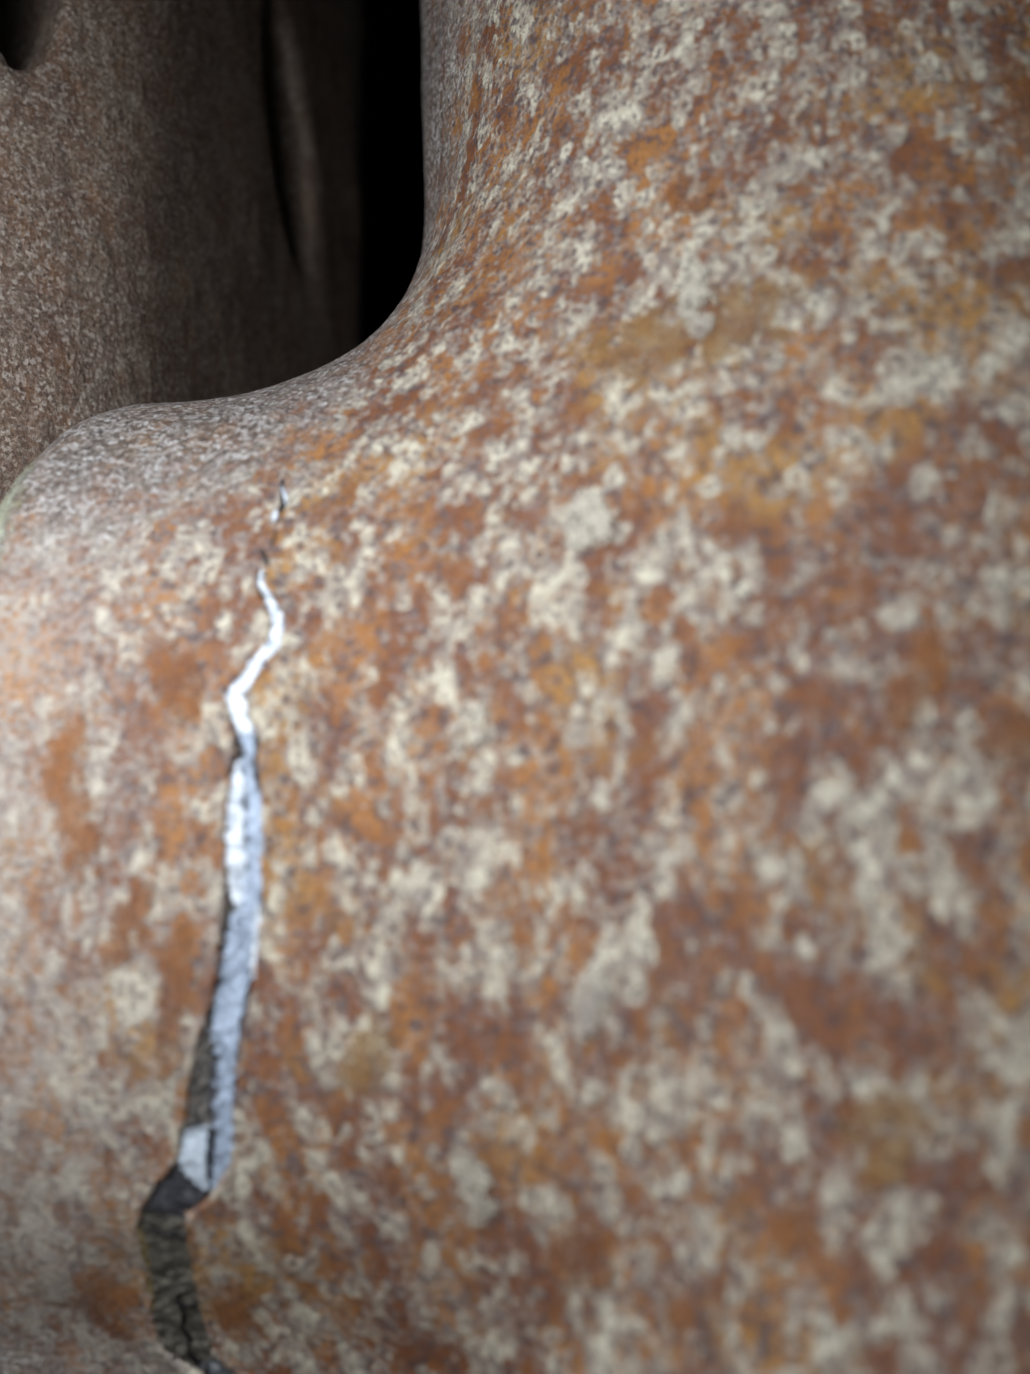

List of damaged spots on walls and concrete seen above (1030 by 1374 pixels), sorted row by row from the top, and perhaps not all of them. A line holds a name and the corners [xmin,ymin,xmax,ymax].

corrosion [144,645,200,718]
corrosion [35,709,100,877]
corrosion [99,881,154,969]
corrosion [153,914,194,1079]
crack [137,478,288,1374]